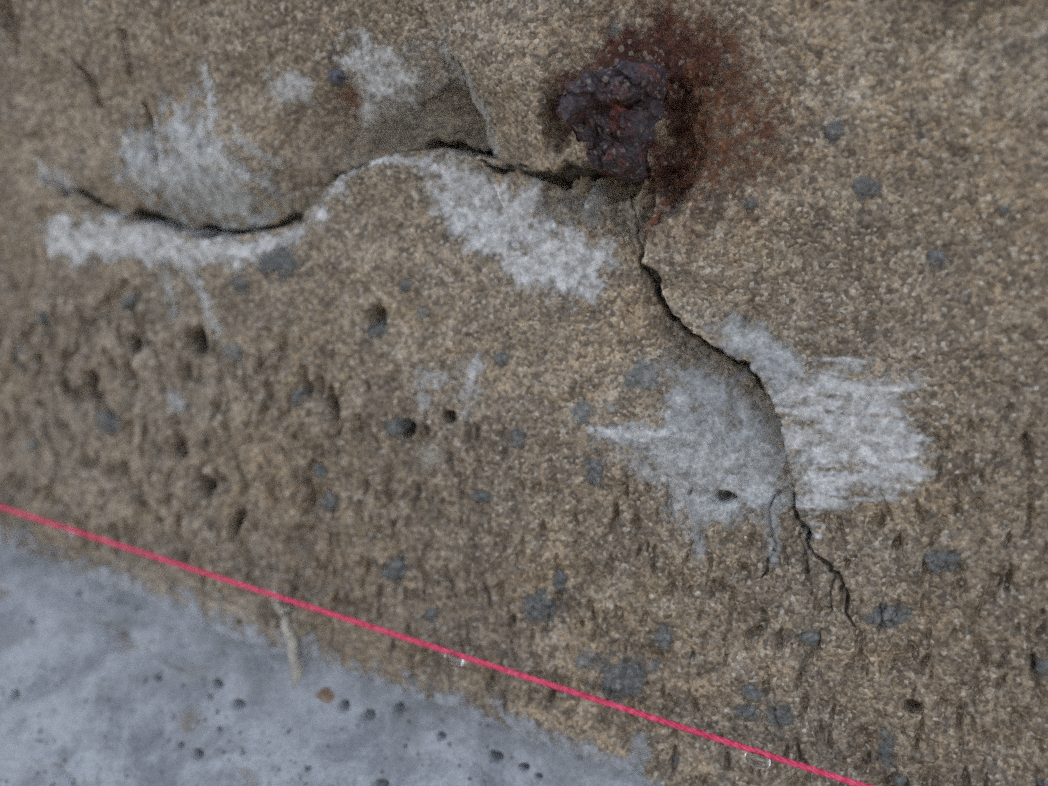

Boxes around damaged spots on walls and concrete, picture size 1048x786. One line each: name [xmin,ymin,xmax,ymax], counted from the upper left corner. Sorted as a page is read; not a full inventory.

crack [64,187,304,238]
water stain [37,65,619,338]
efflorescence [333,28,423,127]
crack [434,143,605,188]
crack [631,190,681,320]
corrosion [555,0,792,236]
efflorescence [588,314,934,558]
crack [763,456,855,626]